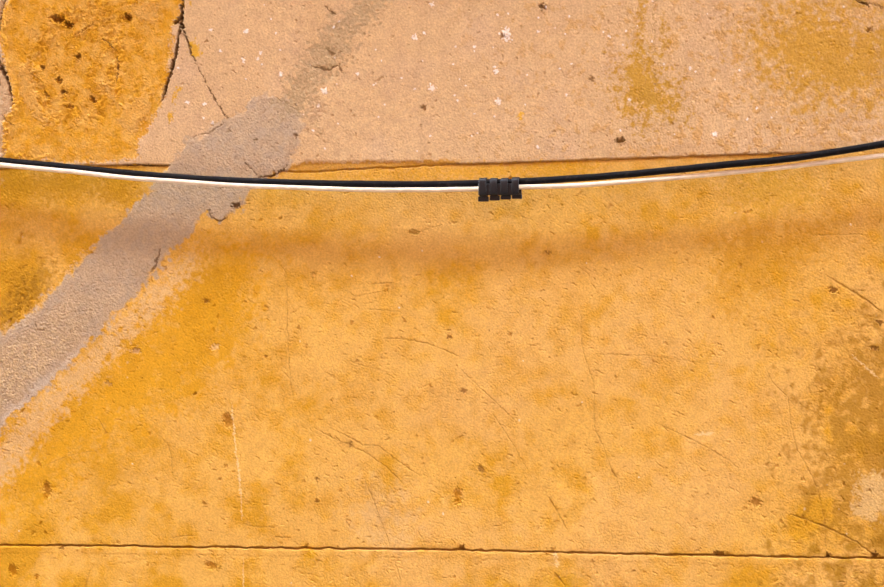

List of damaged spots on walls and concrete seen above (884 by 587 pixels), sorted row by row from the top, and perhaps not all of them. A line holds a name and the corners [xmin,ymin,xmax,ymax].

peeling [0,50,74,156]
spalling [48,14,75,30]
crack [160,0,228,142]
crack [851,0,884,11]